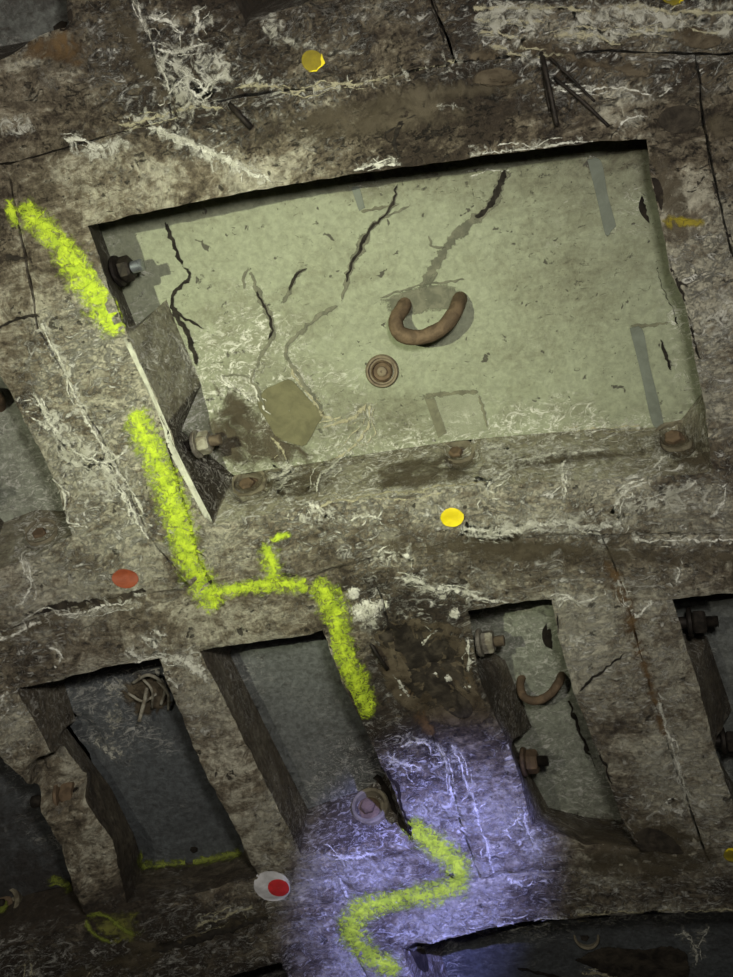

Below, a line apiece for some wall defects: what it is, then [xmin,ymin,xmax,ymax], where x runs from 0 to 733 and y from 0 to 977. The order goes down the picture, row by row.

leakage [64,0,530,185]
leakage [471,137,593,156]
efflorescence [473,0,733,65]
crack [0,314,39,328]
crack [165,222,203,365]
crack [222,184,409,411]
crack [419,168,510,291]
leakage [22,323,149,539]
leakage [0,549,146,644]
rust [605,560,666,736]
crack [568,654,624,784]
spalling [576,946,690,977]